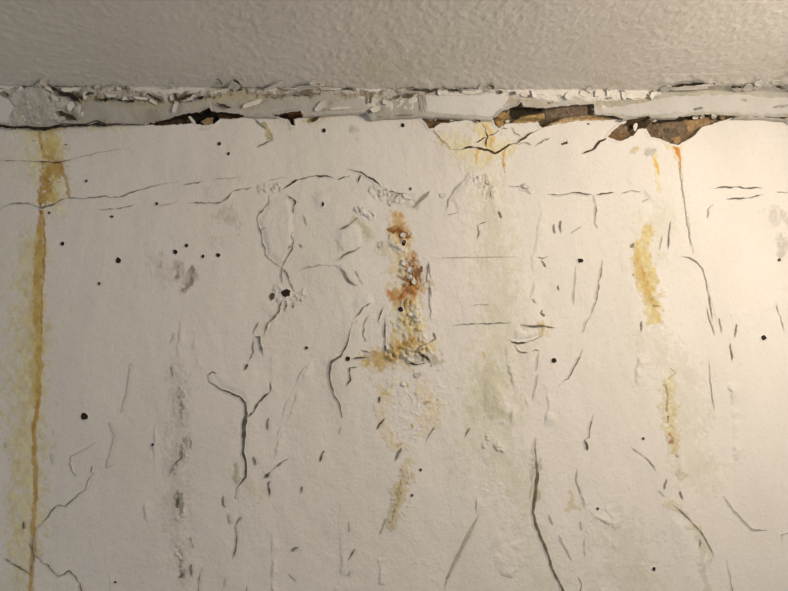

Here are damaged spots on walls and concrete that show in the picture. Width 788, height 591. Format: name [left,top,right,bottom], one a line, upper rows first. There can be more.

leakage [0,116,39,410]
crack [0,169,430,370]
crack [207,370,288,558]
crack [326,247,387,434]
peeling [0,80,788,153]
crack [458,299,554,401]
crack [529,438,586,591]
leakage [424,177,699,591]
crack [547,190,649,234]
leakage [618,308,739,516]
crack [660,165,737,360]
crack [708,186,763,217]